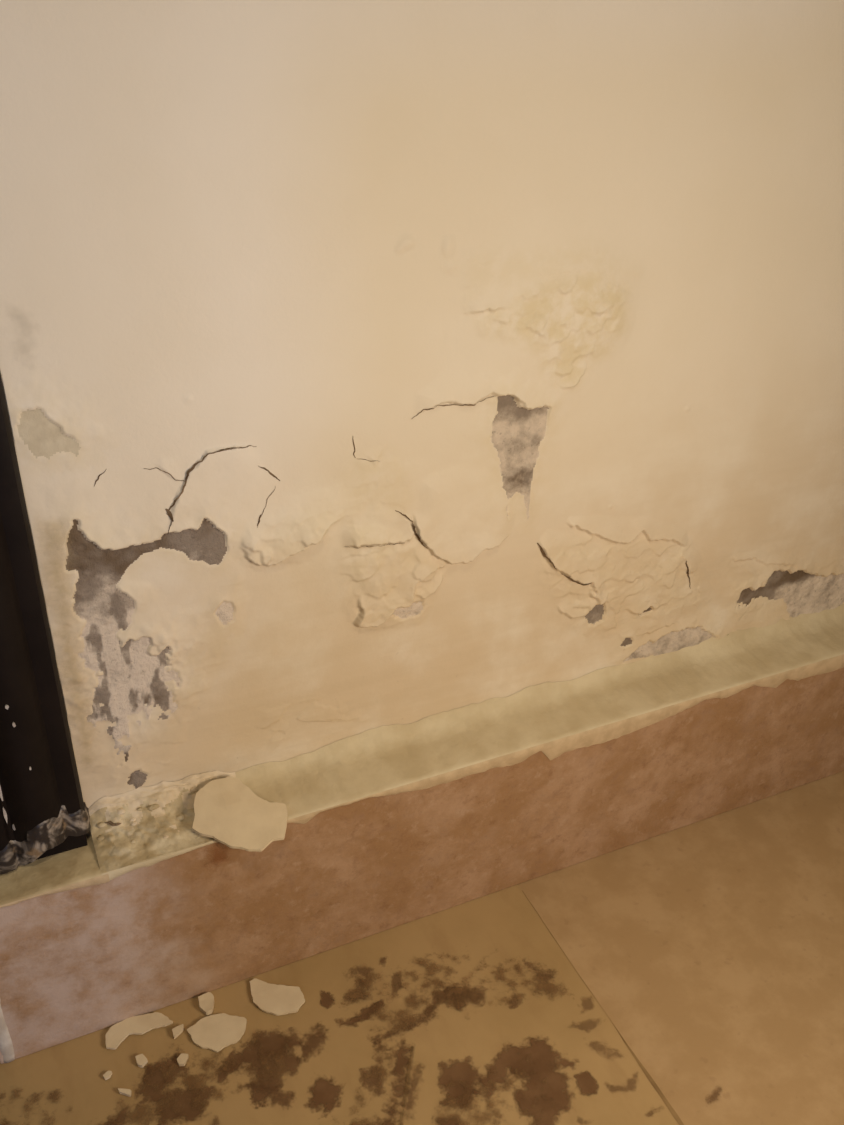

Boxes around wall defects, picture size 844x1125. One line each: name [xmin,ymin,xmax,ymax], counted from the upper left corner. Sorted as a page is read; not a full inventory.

crack [144,445,280,533]
flaking render [0,363,844,880]